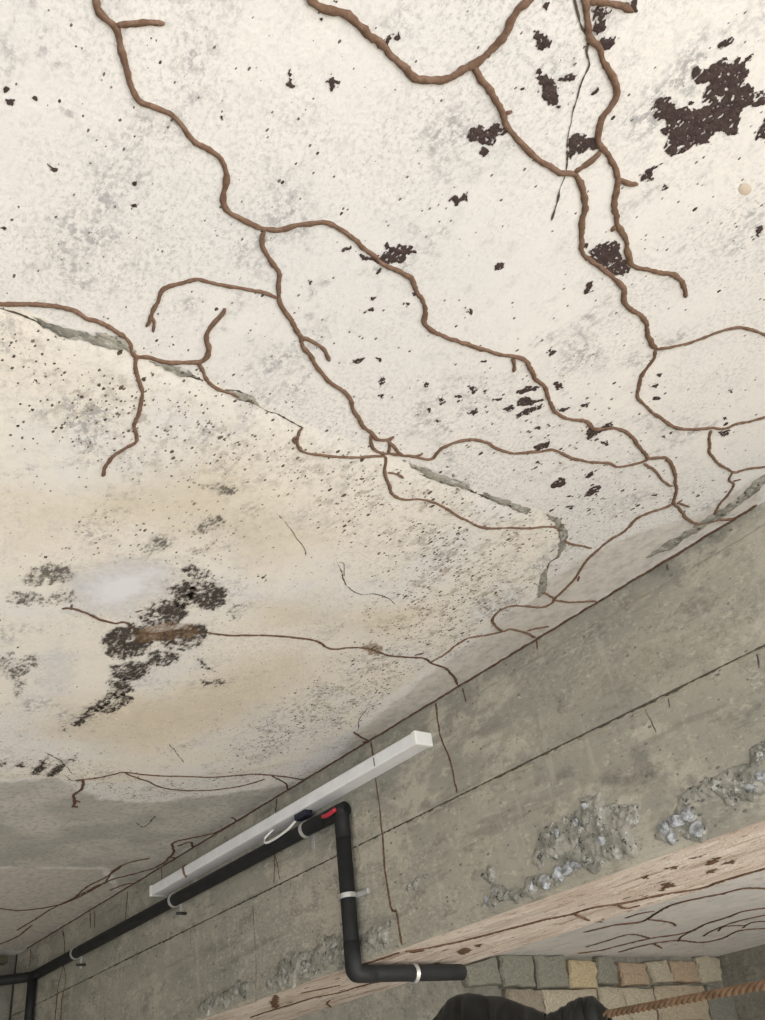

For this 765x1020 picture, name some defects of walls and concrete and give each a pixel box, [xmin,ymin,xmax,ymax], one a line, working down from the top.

crack [551,0,590,220]
crack [0,308,41,326]
crack [232,390,302,428]
peeling [550,471,601,510]
flaking render [646,475,765,558]
crack [337,562,395,604]
water stain [0,516,245,739]
spalling [655,741,765,846]
spalling [479,790,640,909]